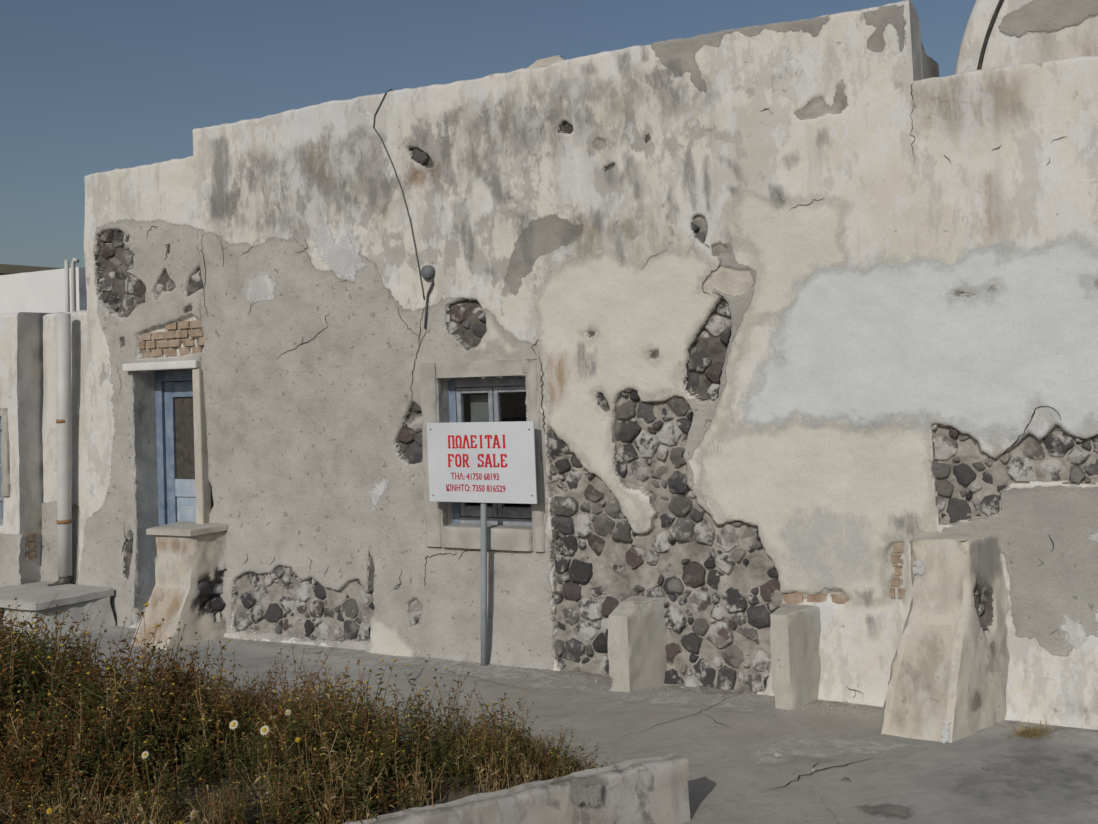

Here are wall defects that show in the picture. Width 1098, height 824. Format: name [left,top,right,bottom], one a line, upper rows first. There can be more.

flaking render [649,14,830,92]
flaking render [863,5,906,52]
crack [395,305,430,394]
flaking render [0,191,850,694]
flaking render [931,424,1098,656]